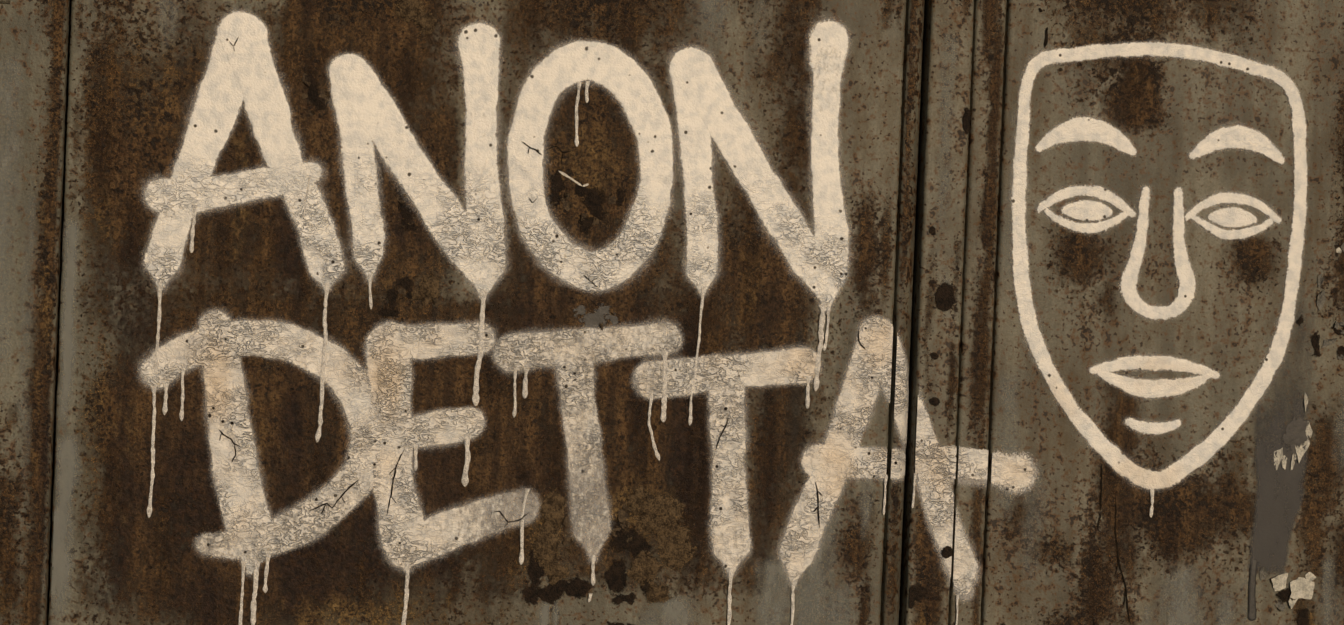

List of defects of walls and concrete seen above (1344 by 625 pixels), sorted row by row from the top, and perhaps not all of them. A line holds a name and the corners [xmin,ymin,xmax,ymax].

corrosion [1039,0,1261,136]
corrosion [0,0,894,625]
corrosion [921,0,1005,450]
corrosion [1044,221,1121,322]
corrosion [1223,225,1282,294]
peeling [1274,392,1313,470]
corrosion [970,370,1256,625]
water stain [647,598,689,625]
water stain [759,562,788,625]
water stain [799,523,848,625]
corrosion [911,490,948,625]
peeling [1259,567,1316,625]